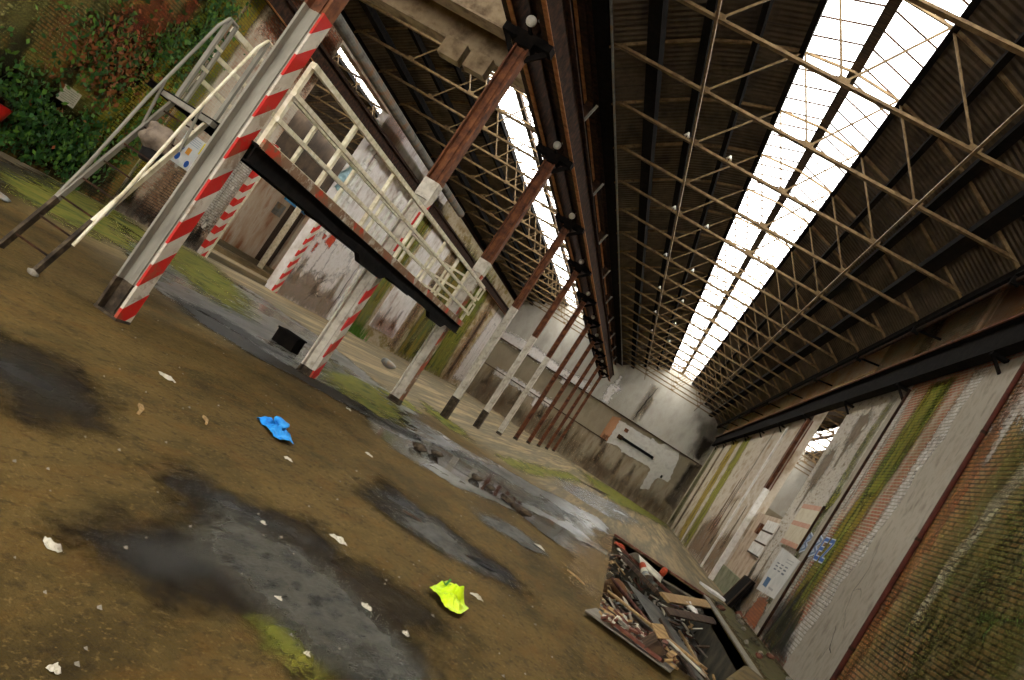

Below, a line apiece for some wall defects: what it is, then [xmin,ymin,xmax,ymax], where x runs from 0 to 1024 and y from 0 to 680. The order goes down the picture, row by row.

rust [311,234,336,252]
damp [155,262,615,559]
peeling [606,421,679,490]
damp [580,424,718,514]
damp [681,479,747,576]
damp [759,365,993,663]